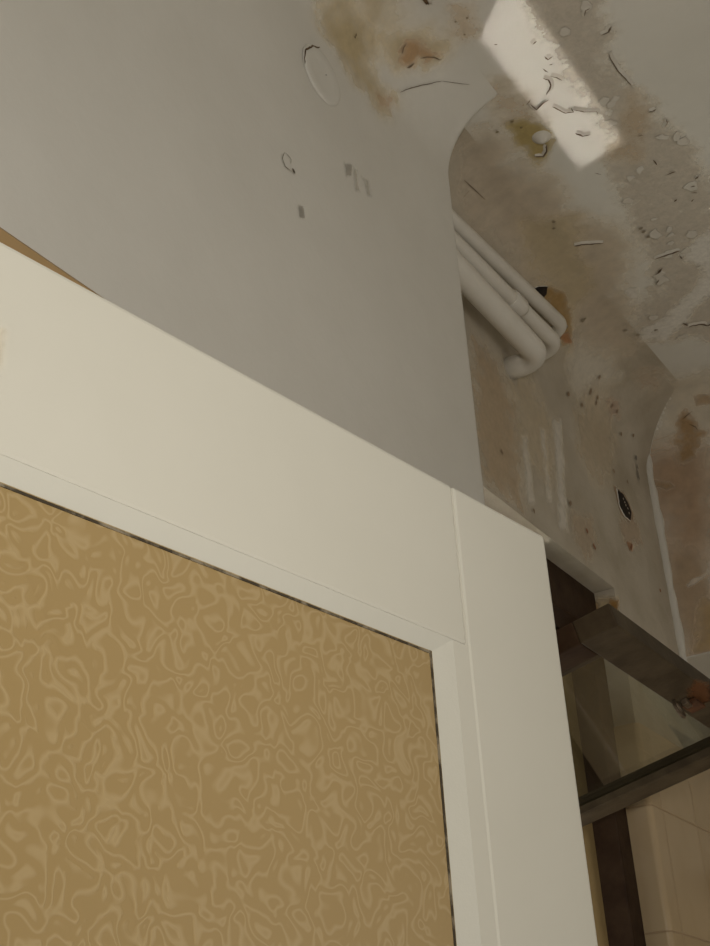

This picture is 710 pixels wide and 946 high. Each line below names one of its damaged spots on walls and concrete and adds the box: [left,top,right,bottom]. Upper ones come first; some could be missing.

leakage [472,337,595,557]
leakage [464,133,710,481]
peeling [527,0,710,345]
flaking render [614,487,634,523]
leakage [650,377,710,657]